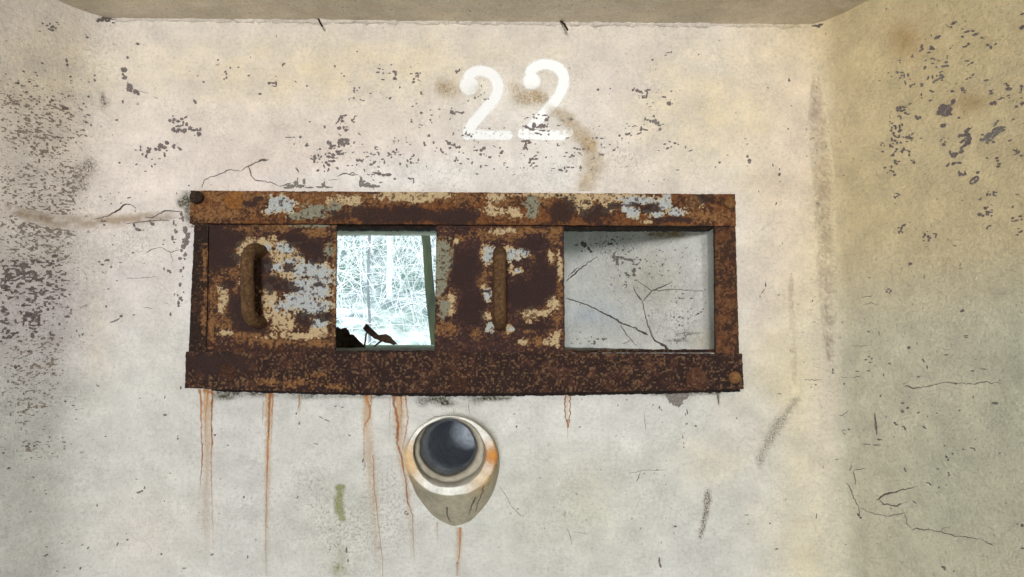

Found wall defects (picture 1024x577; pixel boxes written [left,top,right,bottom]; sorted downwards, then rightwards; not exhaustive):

peeling [0,58,96,460]
peeling [121,56,140,105]
crack [95,204,180,224]
peeling [135,115,202,172]
spalling [162,211,190,316]
crack [202,159,290,186]
peeling [283,64,675,189]
peeling [879,21,1024,185]
crack [906,381,1001,389]
corrosion [198,389,213,483]
corrosion [393,396,416,507]
crack [847,468,993,546]